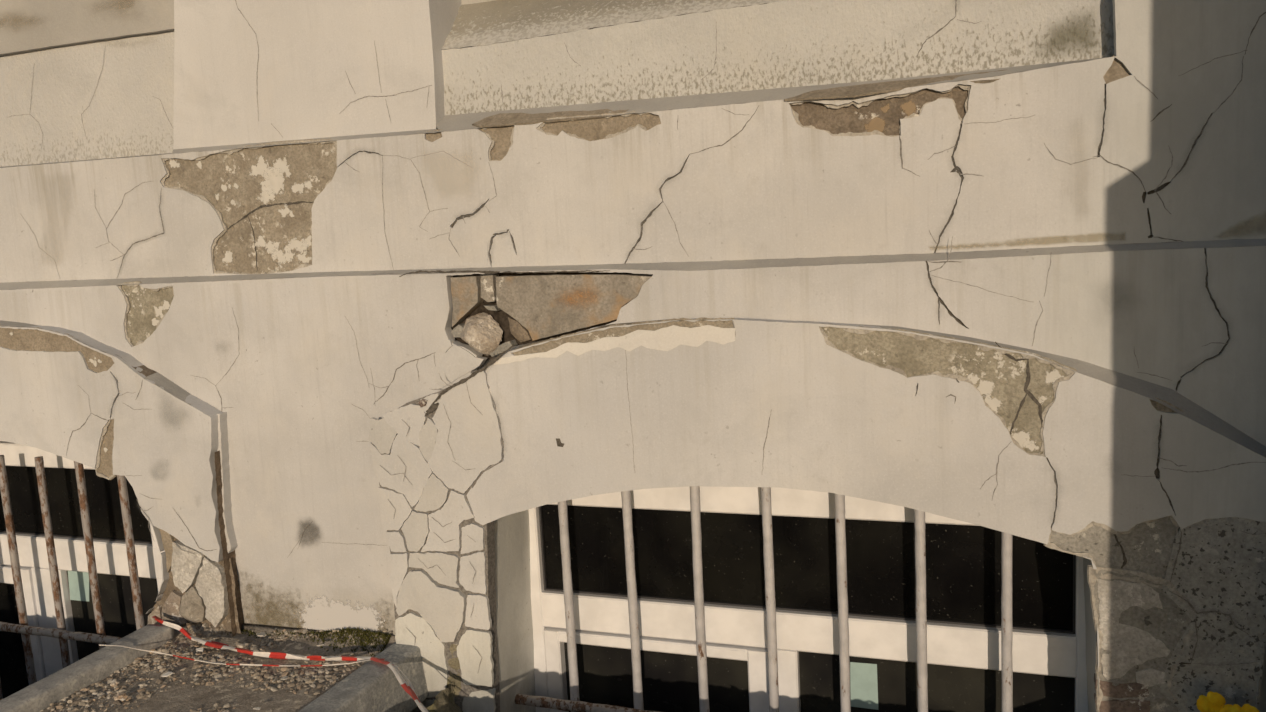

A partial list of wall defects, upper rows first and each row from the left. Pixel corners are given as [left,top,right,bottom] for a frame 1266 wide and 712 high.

crack [917,0,982,56]
crack [94,181,164,277]
flaking render [161,139,338,275]
crack [339,29,759,277]
flaking render [472,109,665,161]
flaking render [784,70,1025,137]
flaking render [118,281,174,347]
spalling [435,272,736,388]
flaking render [819,324,1077,458]
crack [899,12,1266,666]
crack [287,318,513,712]
flaking render [1044,515,1195,712]